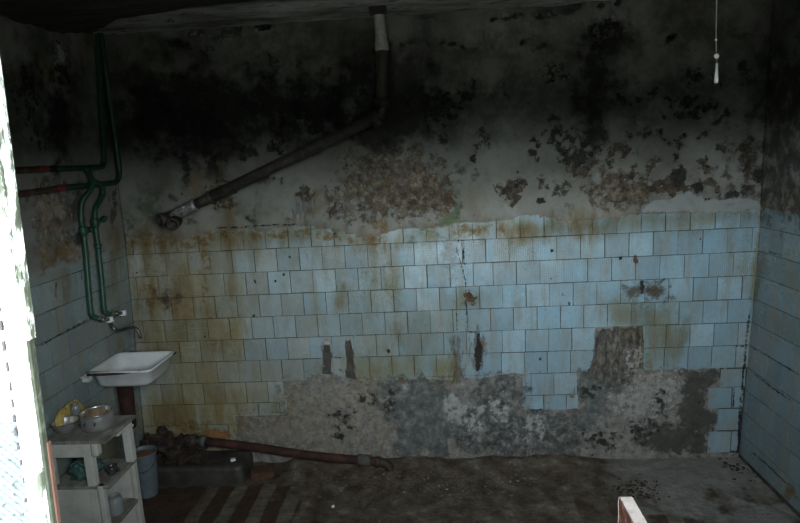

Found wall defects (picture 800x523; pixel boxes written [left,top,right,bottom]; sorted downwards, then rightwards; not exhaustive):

water stain [114,48,376,183]
water stain [349,40,476,156]
mould [527,18,730,204]
water stain [218,186,315,228]
peeling [325,147,461,226]
peeling [494,177,528,208]
peeling [580,141,760,214]
crack [456,232,484,372]
spalling [206,322,739,463]